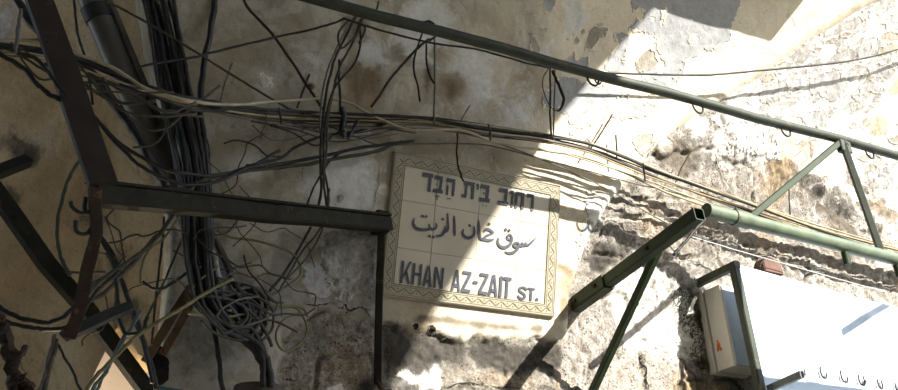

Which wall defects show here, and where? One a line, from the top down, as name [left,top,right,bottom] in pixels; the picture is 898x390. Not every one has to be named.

peeling [813,31,852,54]
peeling [854,0,898,82]
peeling [541,0,741,148]
peeling [711,61,862,128]
peeling [857,153,893,180]
peeling [862,183,898,211]
leakage [418,316,519,329]